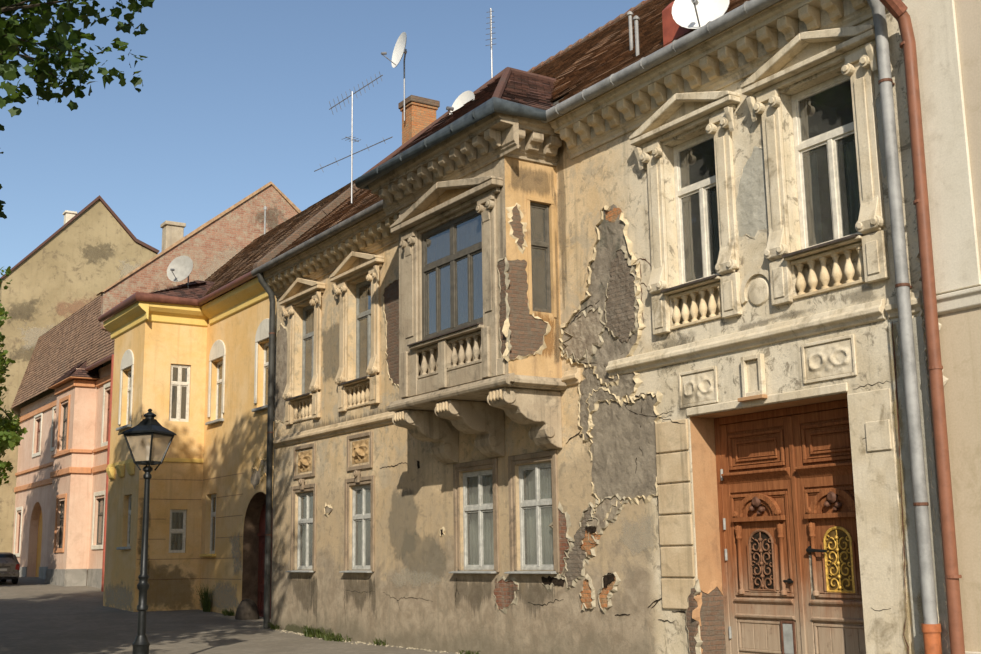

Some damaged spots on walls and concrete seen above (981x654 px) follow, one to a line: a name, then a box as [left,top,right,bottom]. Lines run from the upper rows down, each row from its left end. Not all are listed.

crack [637,258,651,323]
flaking render [382,278,399,389]
spalling [494,203,663,614]
crack [619,393,685,473]
crack [615,598,686,623]
flaking render [686,579,726,654]